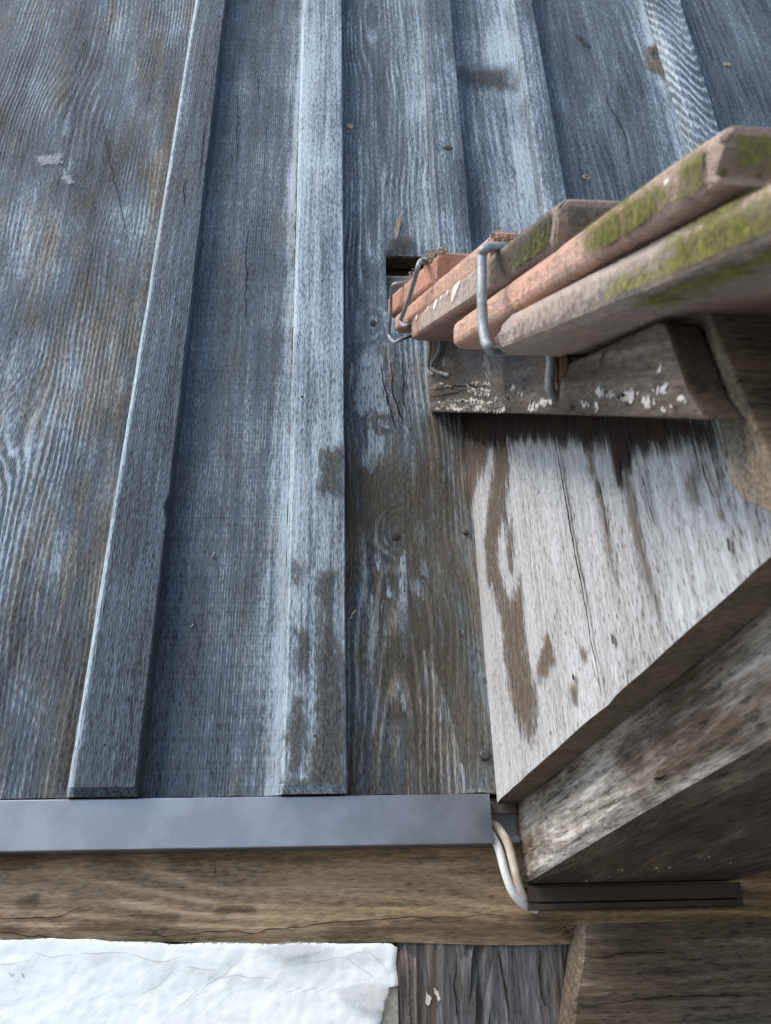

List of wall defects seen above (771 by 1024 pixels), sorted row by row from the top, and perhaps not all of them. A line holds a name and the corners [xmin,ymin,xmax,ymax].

corrosion [642,43,665,76]
crack [102,116,128,250]
crack [381,354,493,430]
peeling [436,381,552,413]
peeling [579,362,686,412]
water stain [395,413,725,784]
crack [553,437,602,696]